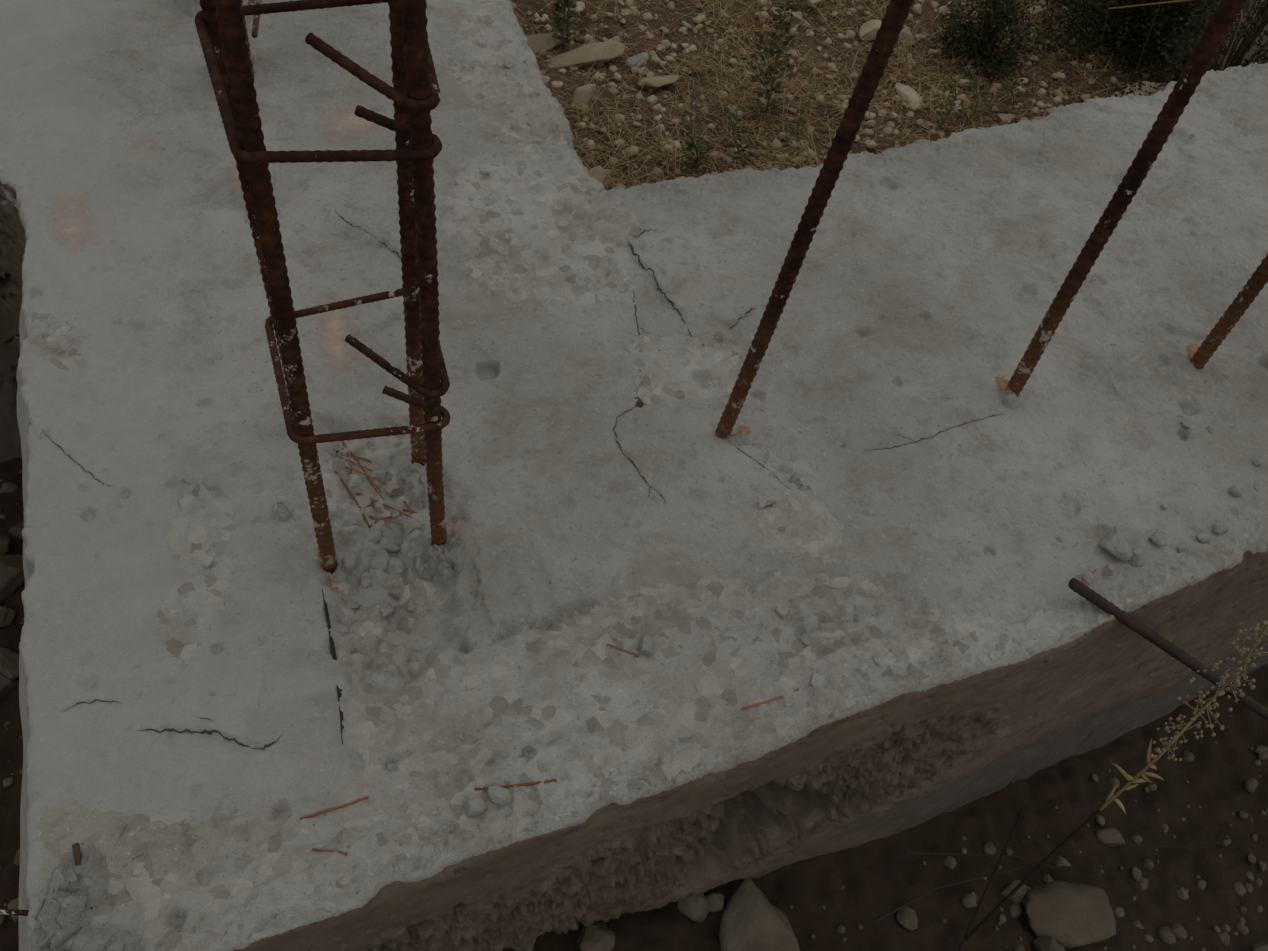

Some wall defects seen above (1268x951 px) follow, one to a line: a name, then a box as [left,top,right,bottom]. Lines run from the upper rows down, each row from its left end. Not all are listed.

crack [628,229,757,346]
crack [613,405,666,503]
crack [70,699,122,708]
crack [137,718,280,750]